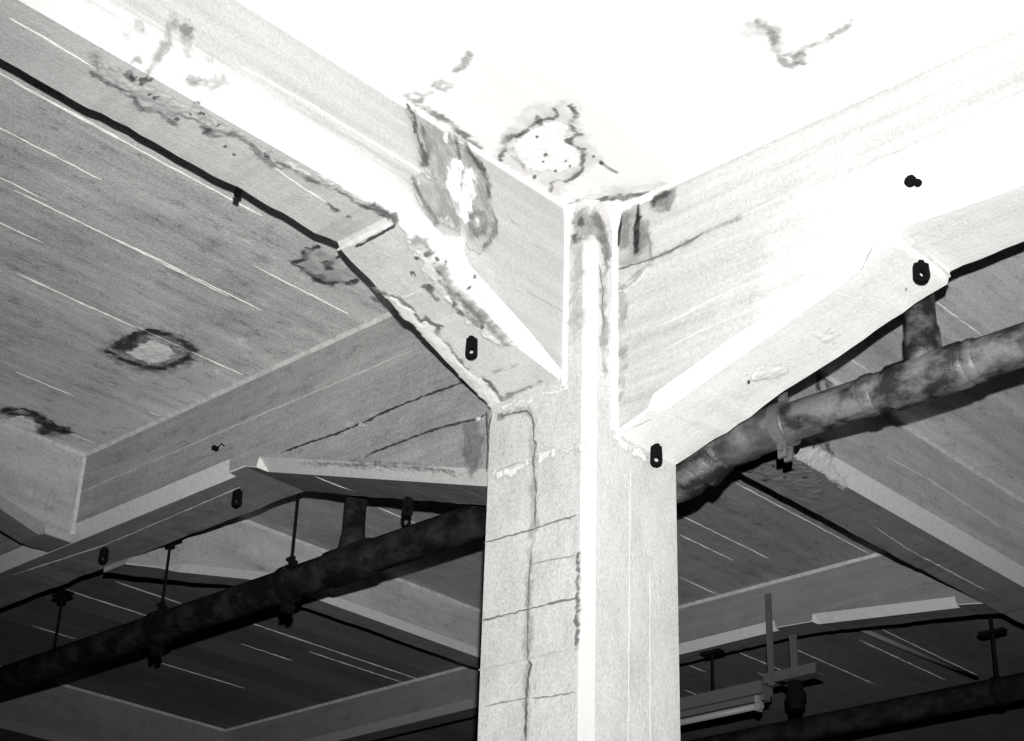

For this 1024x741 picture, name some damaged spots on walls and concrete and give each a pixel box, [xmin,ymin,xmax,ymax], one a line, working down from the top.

damp [498,105,603,192]
spalling [91,56,518,348]
damp [291,245,359,286]
damp [572,214,609,268]
damp [104,329,199,371]
peeling [372,287,502,408]
damp [0,407,74,435]
crack [281,381,576,741]